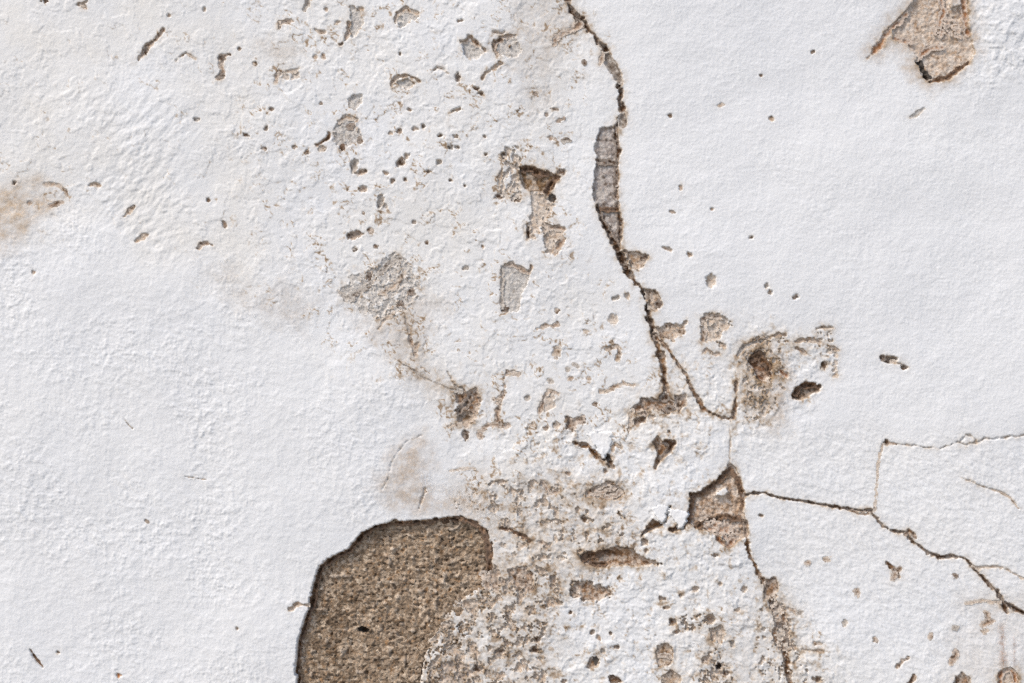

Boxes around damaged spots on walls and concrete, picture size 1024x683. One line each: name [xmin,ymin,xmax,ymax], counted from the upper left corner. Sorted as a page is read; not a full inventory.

spalling [866,0,974,83]
peeling [337,244,485,442]
peeling [499,261,532,314]
spalling [494,146,566,256]
crack [552,0,738,465]
peeling [737,326,839,420]
spalling [288,464,748,683]
crack [742,439,1024,683]